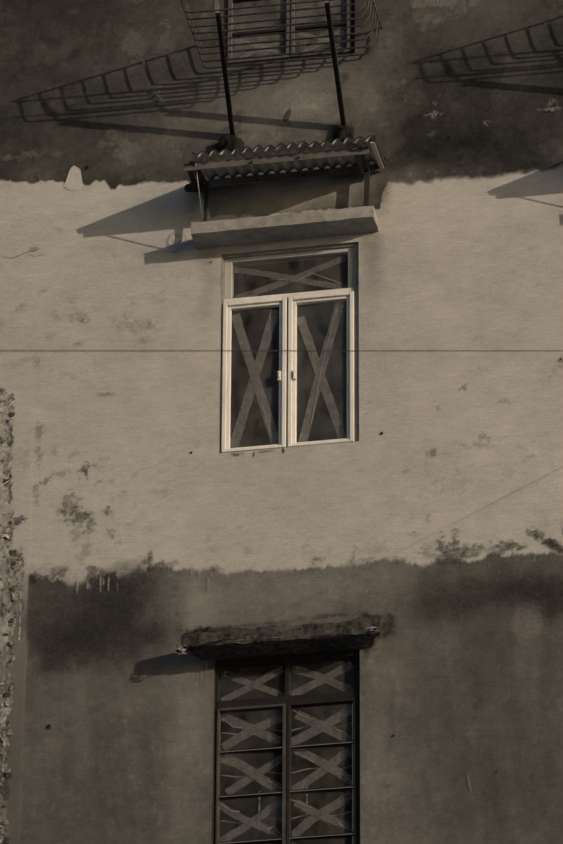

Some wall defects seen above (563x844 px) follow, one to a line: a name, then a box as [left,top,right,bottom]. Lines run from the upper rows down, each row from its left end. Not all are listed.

peeling [0,388,25,844]
peeling [533,529,563,553]